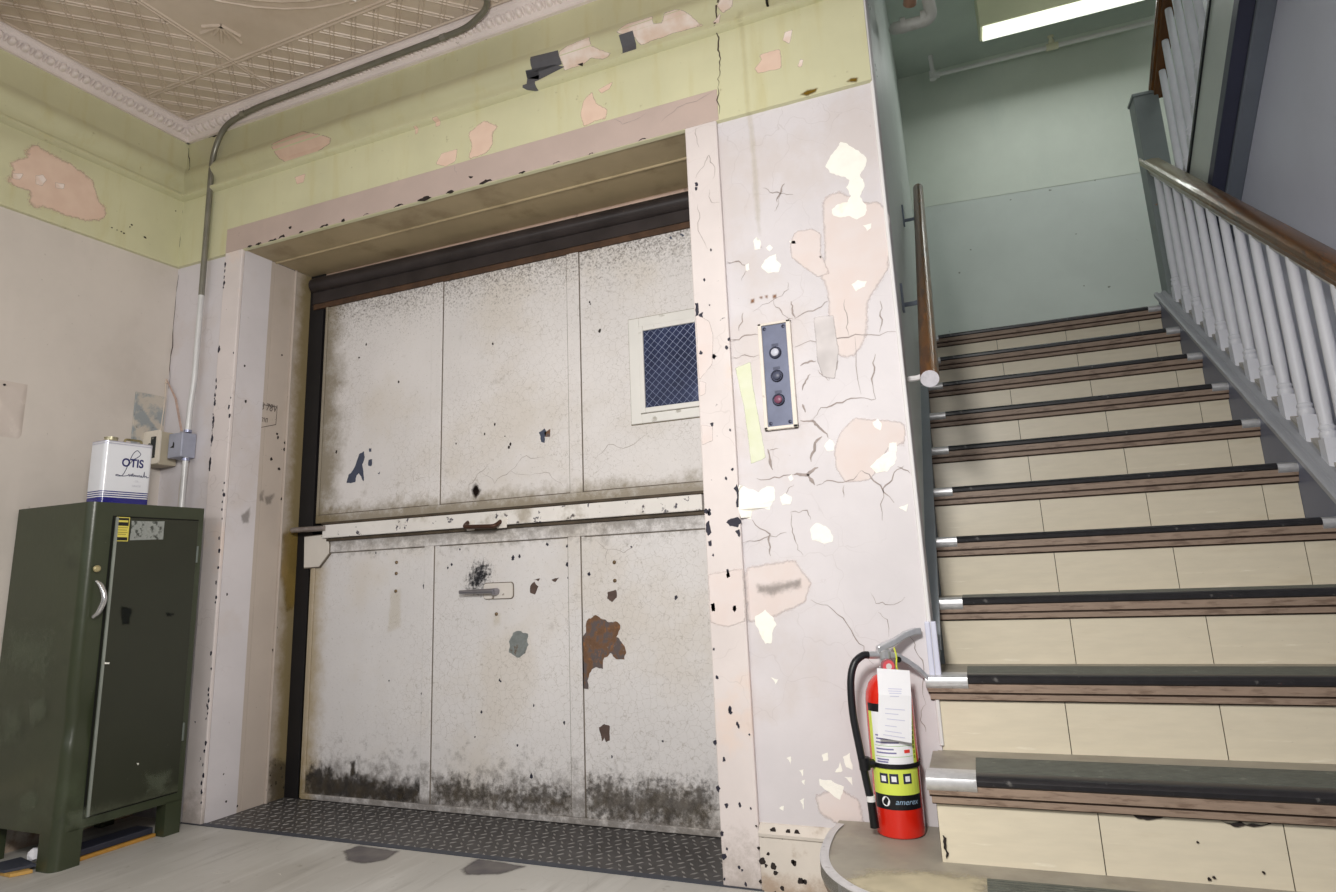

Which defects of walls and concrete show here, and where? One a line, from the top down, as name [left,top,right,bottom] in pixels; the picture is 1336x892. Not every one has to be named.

peeling [559,37,610,70]
peeling [617,0,733,45]
peeling [581,82,612,125]
crack [617,0,745,280]
peeling [8,145,147,239]
crack [766,184,793,209]
peeling [825,142,871,231]
crack [731,283,910,556]
water stain [281,532,298,608]
corrosion [582,615,626,689]
water stain [270,763,286,801]
water stain [305,762,420,807]